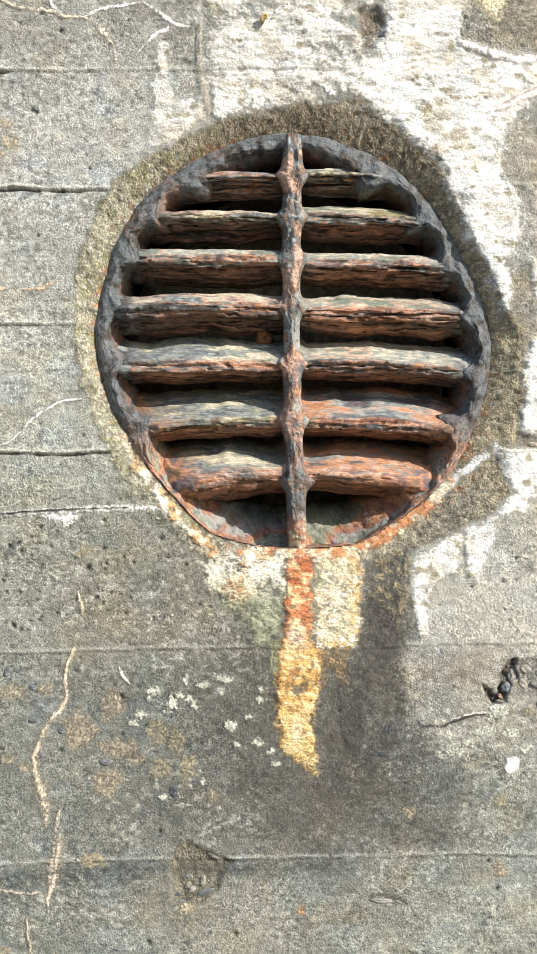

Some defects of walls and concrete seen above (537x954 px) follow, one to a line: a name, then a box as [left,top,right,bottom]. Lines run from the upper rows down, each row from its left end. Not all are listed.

crack [1,0,211,119]
damp [145,0,537,312]
damp [520,333,537,435]
damp [123,443,230,558]
crack [77,590,85,613]
corrosion [200,476,455,774]
damp [227,442,537,818]
spalling [437,658,537,759]
crack [0,645,76,953]